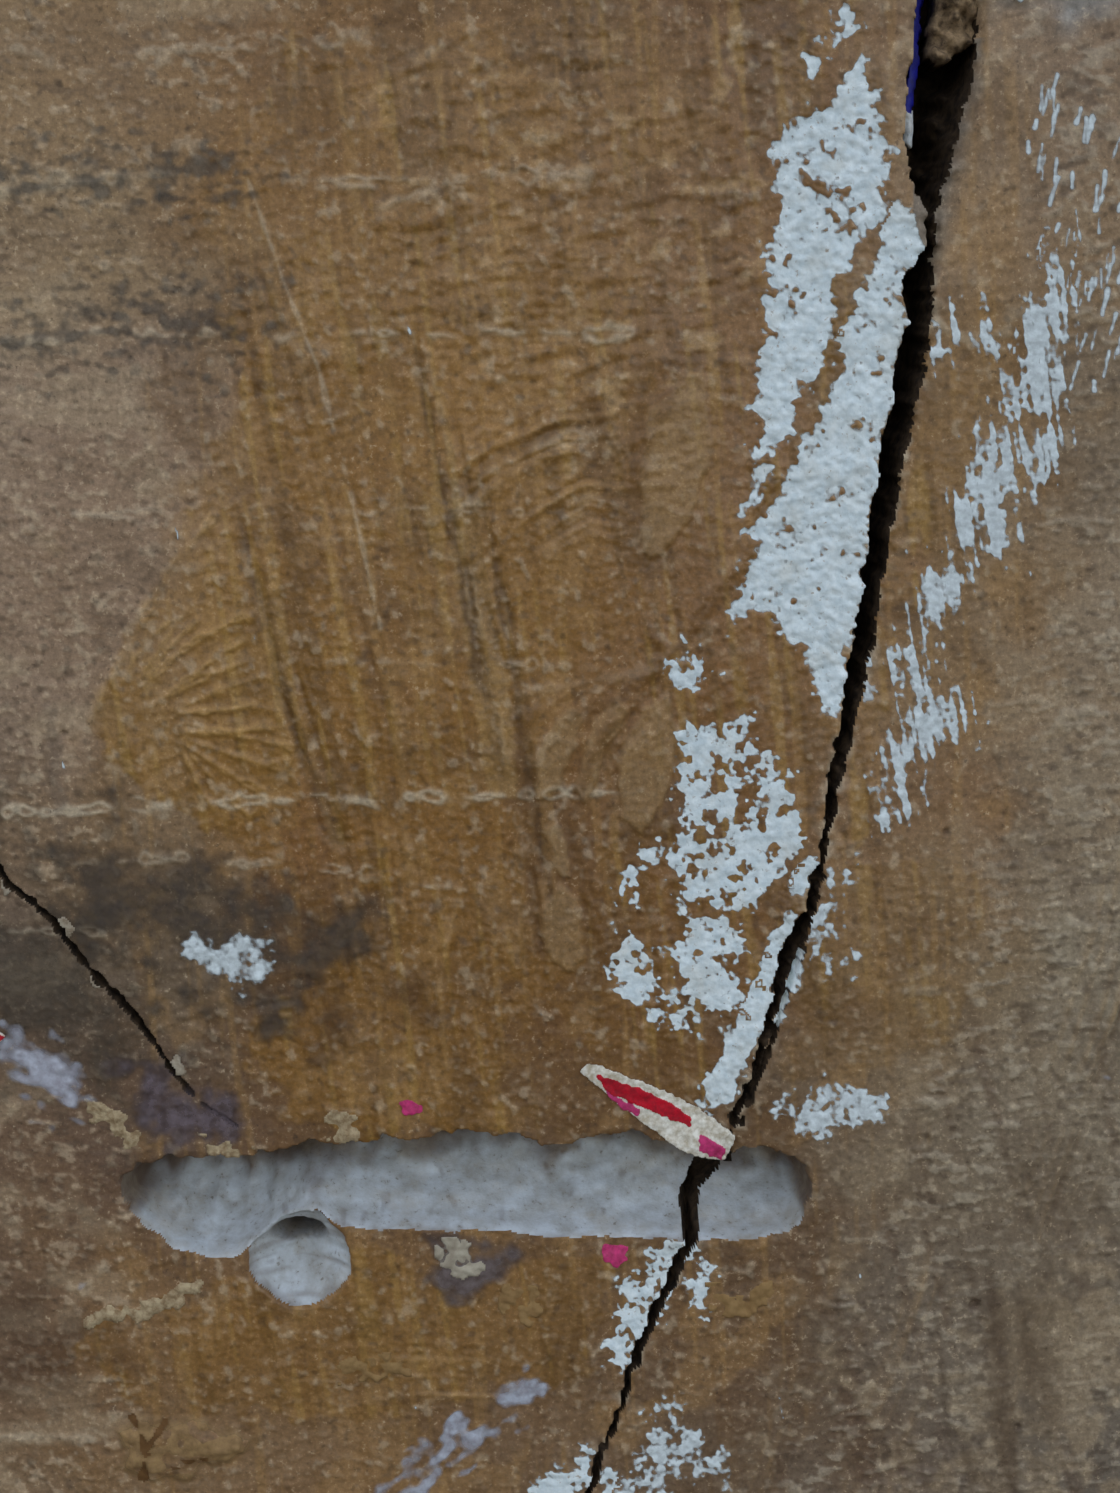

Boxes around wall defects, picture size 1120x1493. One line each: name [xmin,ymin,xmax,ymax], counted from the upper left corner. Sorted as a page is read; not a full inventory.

peeling [800,3,867,79]
peeling [725,54,1120,833]
peeling [664,634,726,693]
crack [584,0,979,1493]
peeling [604,711,862,1116]
crack [0,864,209,1108]
spalling [197,1132,255,1158]
spalling [324,1110,360,1145]
spalling [434,1237,485,1280]
peeling [600,1239,774,1374]
peeling [527,1395,731,1493]